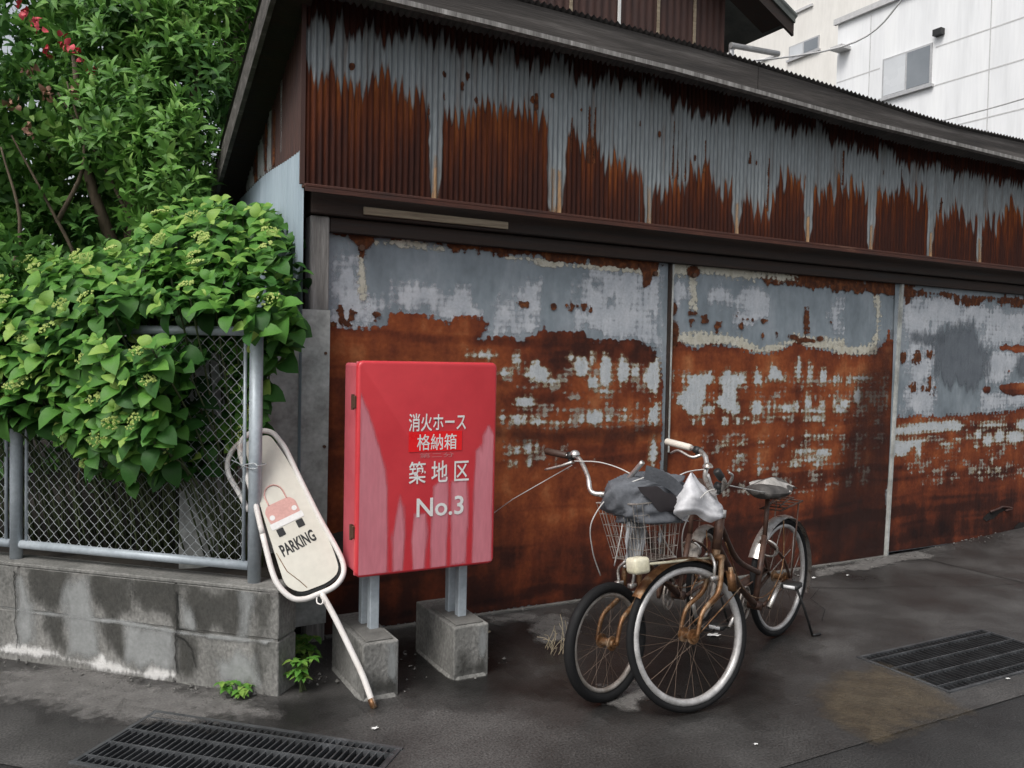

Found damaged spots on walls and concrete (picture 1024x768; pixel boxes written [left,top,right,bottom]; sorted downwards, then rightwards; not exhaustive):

rust [305,0,1024,267]
peeling [374,239,445,251]
peeling [330,255,543,337]
rust [424,242,664,288]
peeling [465,349,565,387]
peeling [499,255,882,468]
peeling [894,295,1024,474]
rust [327,302,1024,614]
water stain [1,569,269,683]
rust [324,552,359,635]
rust [379,568,446,626]